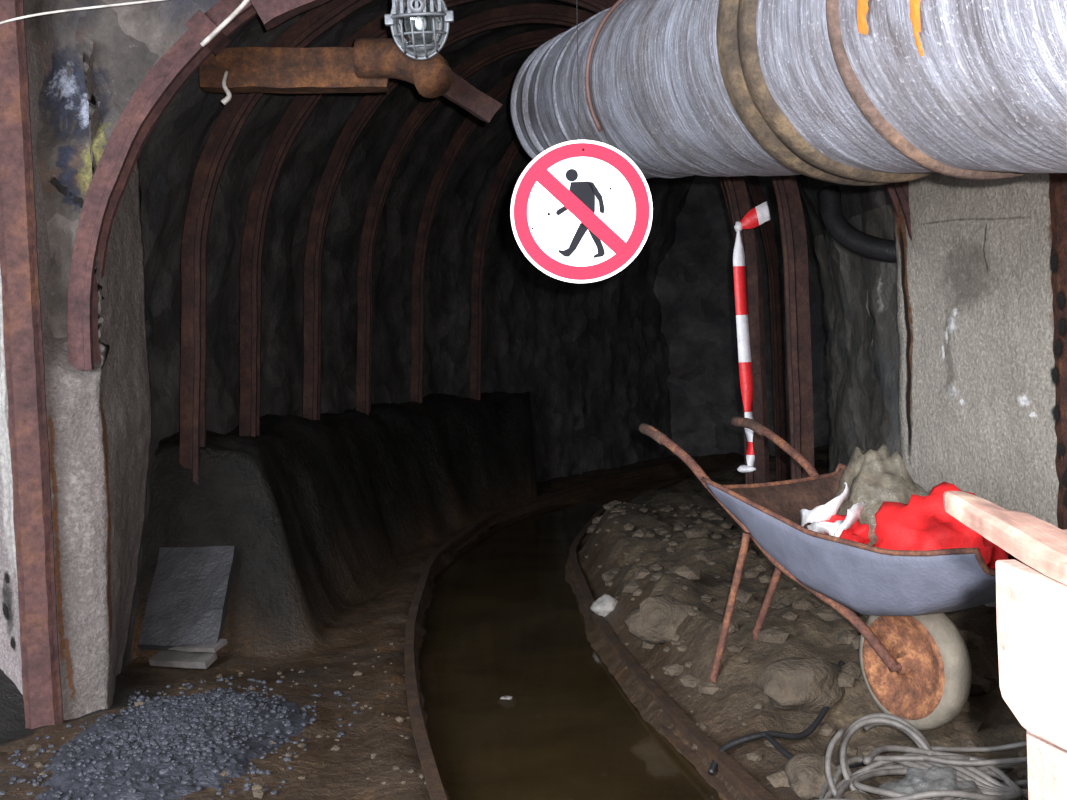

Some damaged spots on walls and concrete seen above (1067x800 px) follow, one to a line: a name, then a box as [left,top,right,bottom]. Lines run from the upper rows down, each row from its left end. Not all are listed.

damp [38,52,106,205]
corrosion [1050,253,1058,272]
corrosion [1051,291,1067,386]
corrosion [1052,405,1060,424]
corrosion [1057,442,1067,508]